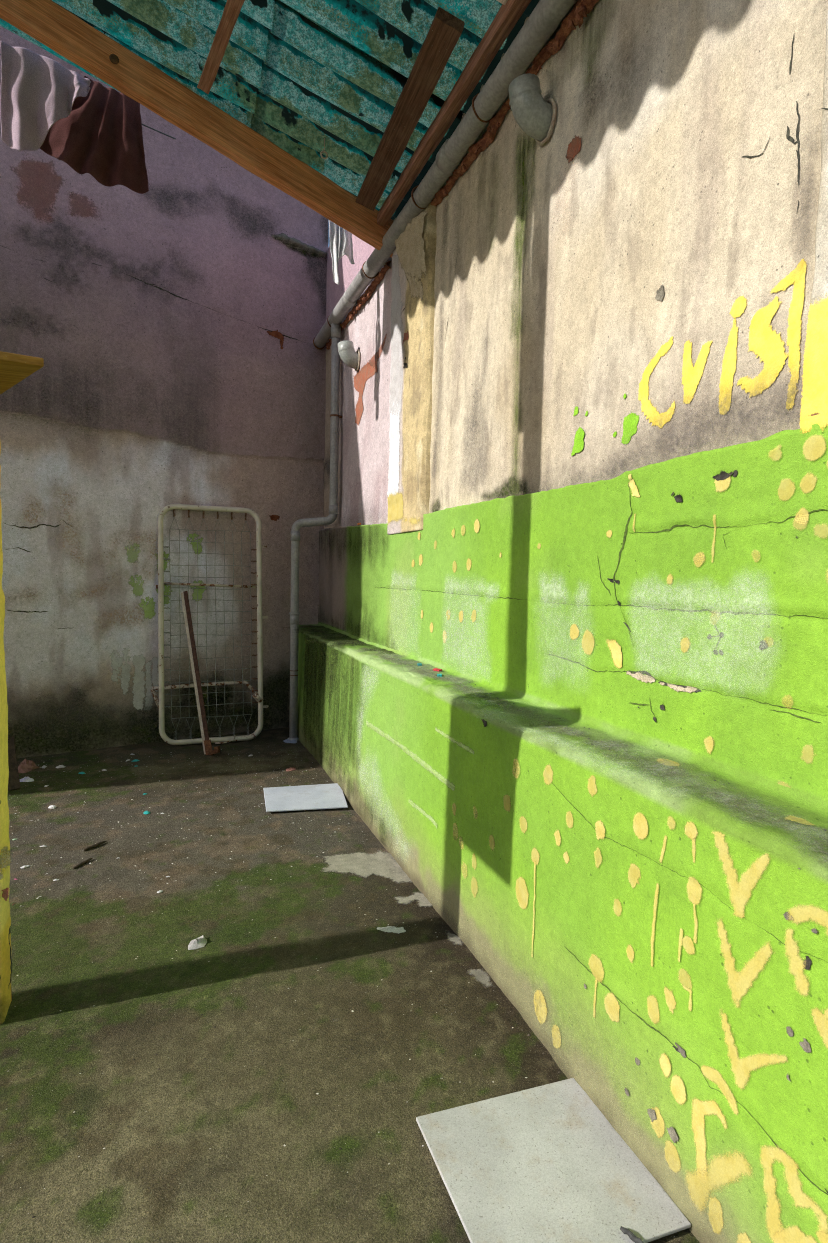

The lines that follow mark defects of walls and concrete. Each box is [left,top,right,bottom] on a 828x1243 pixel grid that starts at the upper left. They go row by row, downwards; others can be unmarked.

flaking render [566,136,581,163]
crack [742,31,828,214]
flaking render [354,334,387,425]
crack [4,519,92,552]
crack [375,480,828,723]
flaking render [607,639,697,693]